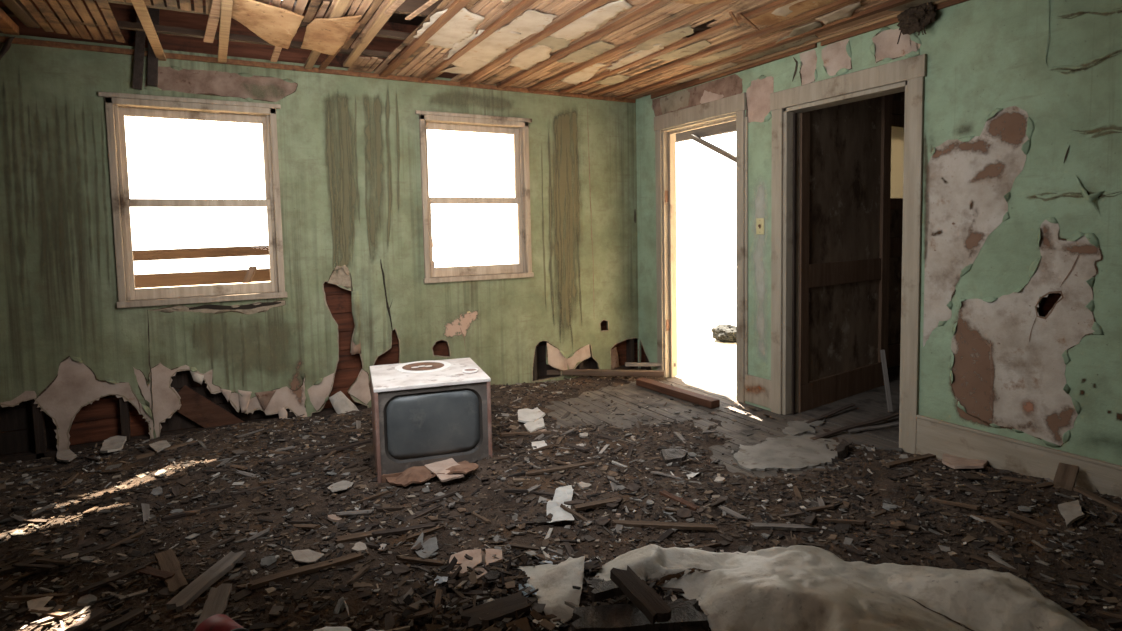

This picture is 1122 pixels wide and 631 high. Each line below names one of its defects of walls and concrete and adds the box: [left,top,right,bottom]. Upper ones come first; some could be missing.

peeling [799,39,852,85]
peeling [870,26,921,63]
crack [1045,0,1067,72]
peeling [745,75,774,124]
leakage [325,90,400,272]
leakage [541,110,582,344]
peeling [923,106,1104,448]
peeling [0,265,401,455]
peeling [432,310,478,358]
spalling [532,338,652,382]